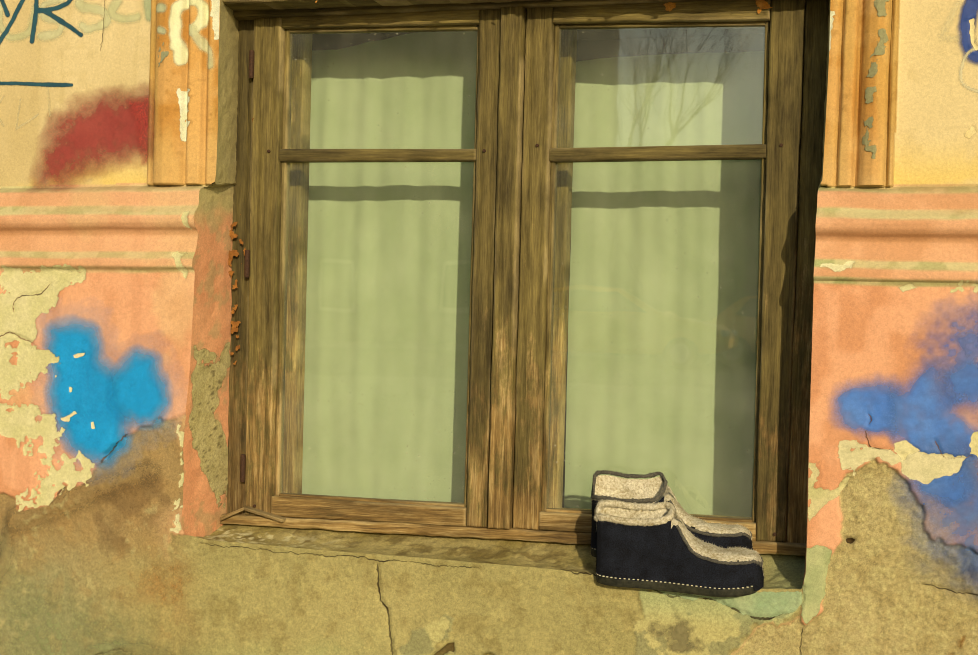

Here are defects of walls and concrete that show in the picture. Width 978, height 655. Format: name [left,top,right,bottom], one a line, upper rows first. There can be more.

peeling [210,0,220,40]
peeling [865,0,889,104]
peeling [176,88,190,141]
peeling [862,117,877,159]
peeling [228,214,246,289]
peeling [820,261,855,272]
crack [0,284,50,342]
spalling [0,264,241,655]
spalling [660,432,978,655]
crack [206,543,479,655]
spalling [434,643,455,655]